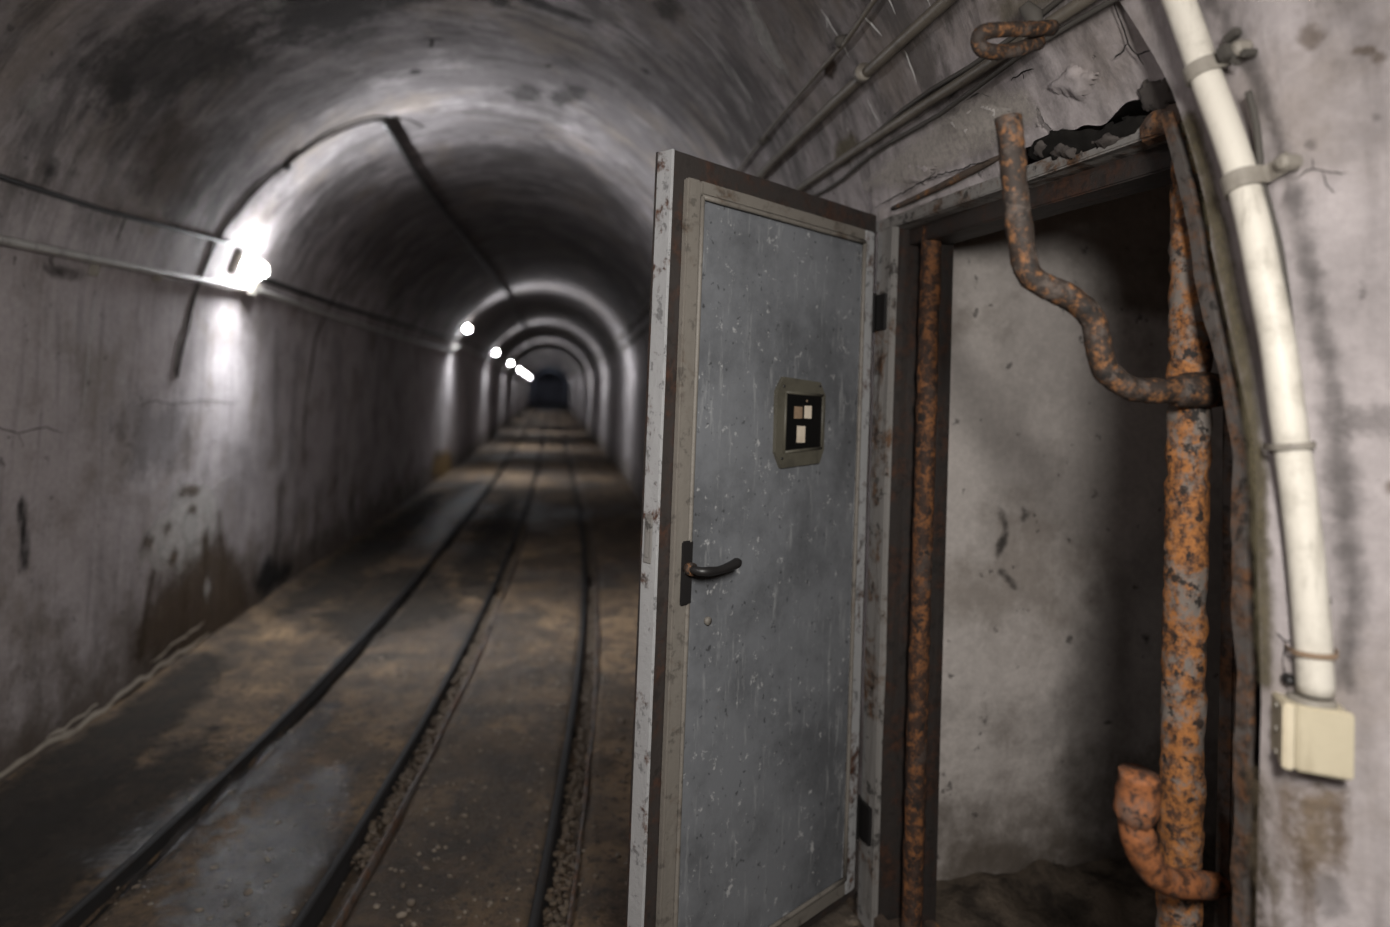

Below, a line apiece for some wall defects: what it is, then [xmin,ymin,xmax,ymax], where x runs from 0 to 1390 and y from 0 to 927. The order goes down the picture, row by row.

spalling [1027,77,1175,161]
water stain [138,511,291,666]
water stain [78,692,361,927]